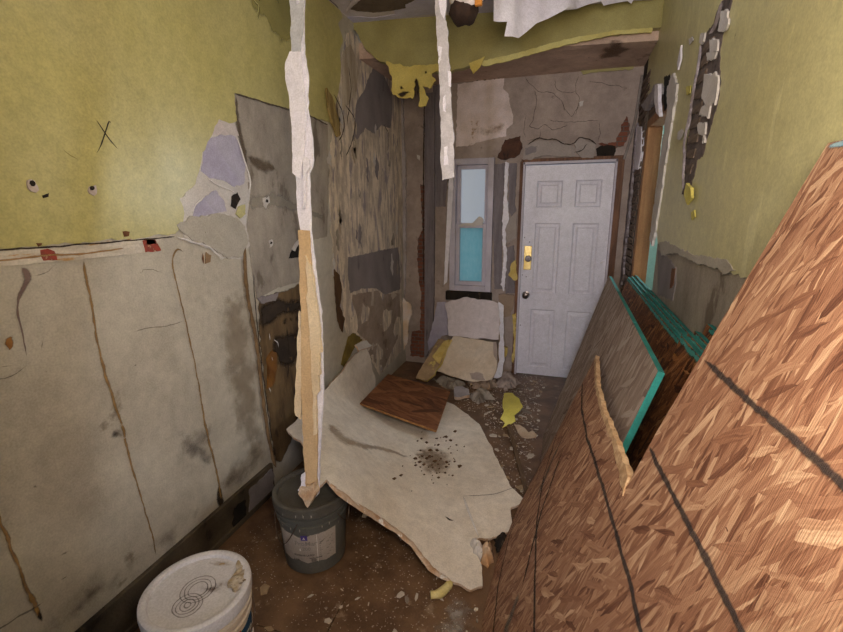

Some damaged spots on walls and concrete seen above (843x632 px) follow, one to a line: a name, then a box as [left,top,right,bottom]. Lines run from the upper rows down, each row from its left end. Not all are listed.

peeling [347,0,451,23]
peeling [478,0,494,13]
peeling [456,56,513,147]
crack [524,77,601,152]
spalling [677,0,733,220]
flaking render [177,51,449,299]
flaking render [410,184,425,358]
peeling [657,241,736,301]
water stain [172,249,235,506]